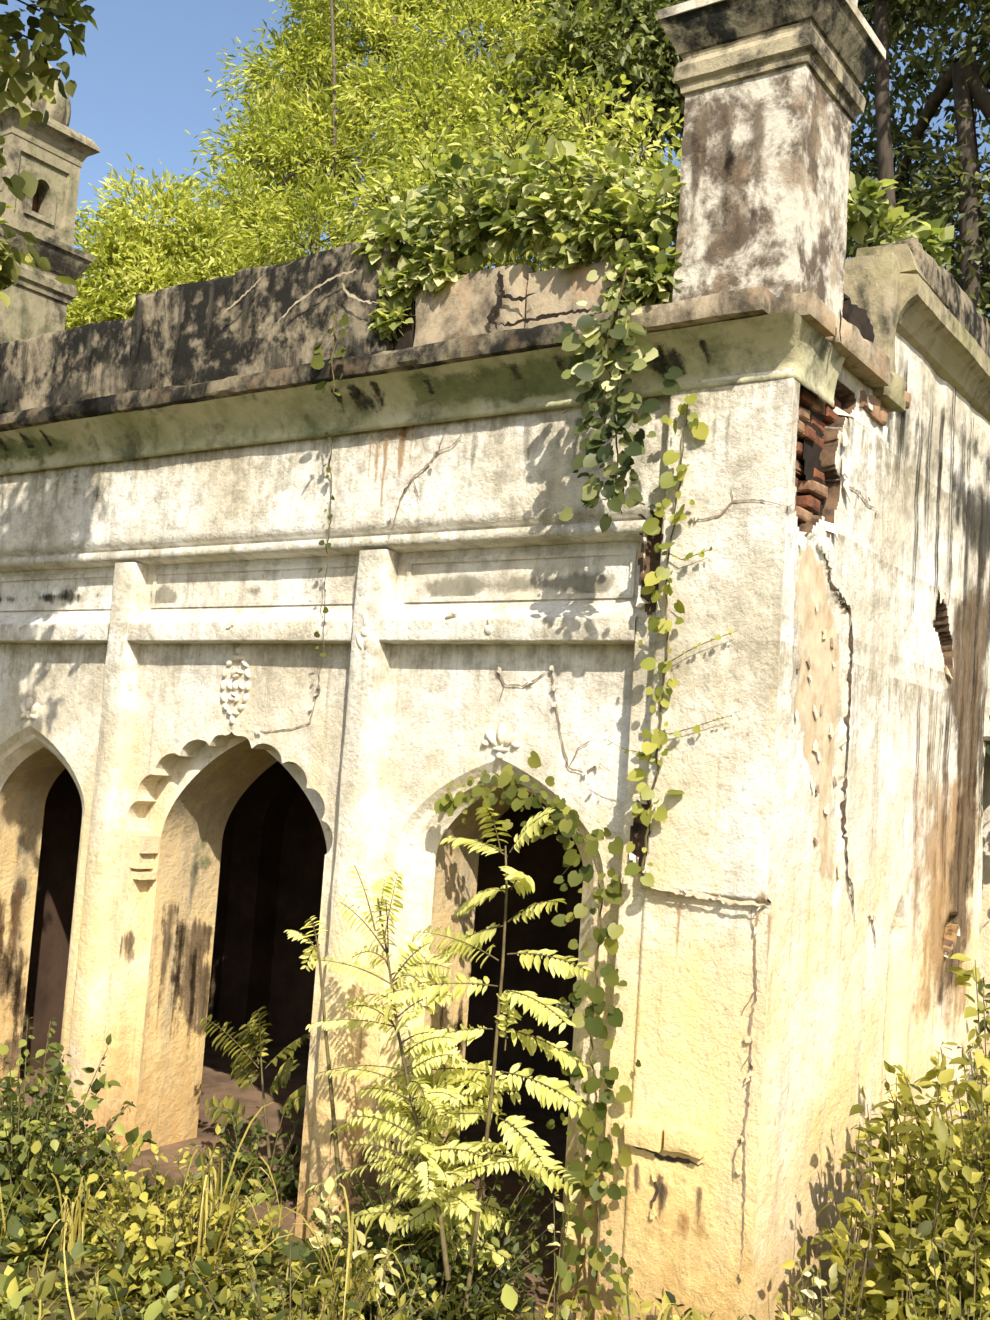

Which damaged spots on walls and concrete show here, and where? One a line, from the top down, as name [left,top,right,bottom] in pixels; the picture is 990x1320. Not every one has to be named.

damp [691,99,766,240]
damp [45,300,162,404]
damp [264,347,297,370]
damp [331,381,384,412]
crack [486,271,602,330]
crack [388,433,461,542]
peeling [794,388,911,879]
damp [890,362,990,1003]
crack [824,554,878,1006]
damp [0,876,31,1071]
damp [158,904,215,1033]
crack [633,910,758,1281]